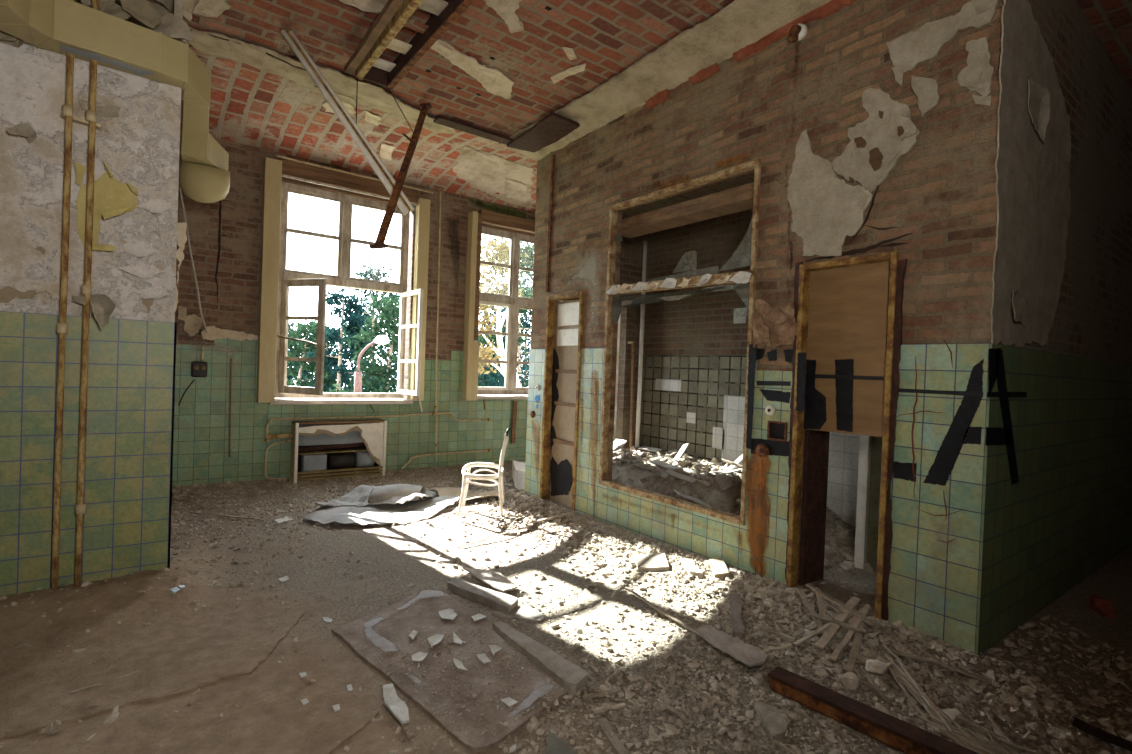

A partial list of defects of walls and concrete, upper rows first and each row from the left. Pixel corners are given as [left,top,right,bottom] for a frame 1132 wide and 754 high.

flaking render [485,0,524,34]
spalling [733,0,856,63]
flaking render [81,0,456,134]
flaking render [431,39,514,99]
flaking render [550,47,586,84]
spalling [687,63,720,85]
flaking render [6,124,37,142]
flaking render [378,143,395,160]
flaking render [452,146,535,210]
flaking render [787,0,1071,348]
flaking render [73,161,258,341]
rust [747,450,771,575]